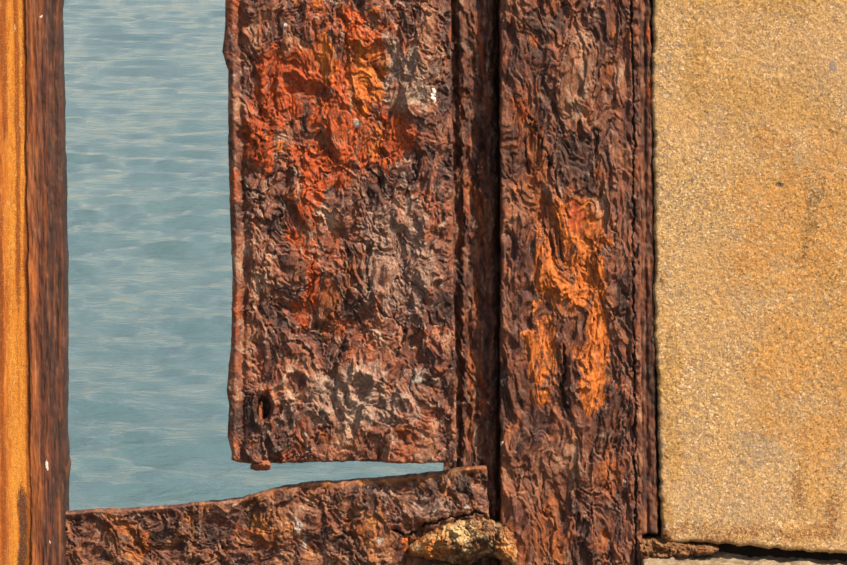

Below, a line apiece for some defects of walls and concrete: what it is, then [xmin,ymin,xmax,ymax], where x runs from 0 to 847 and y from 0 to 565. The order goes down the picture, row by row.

corrosion [239,0,431,345]
corrosion [0,0,32,565]
corrosion [510,93,618,419]
corrosion [280,359,434,444]
corrosion [464,330,481,433]
crack [558,344,570,409]
corrosion [250,460,271,471]
corrosion [99,520,151,562]
corrosion [593,526,610,556]